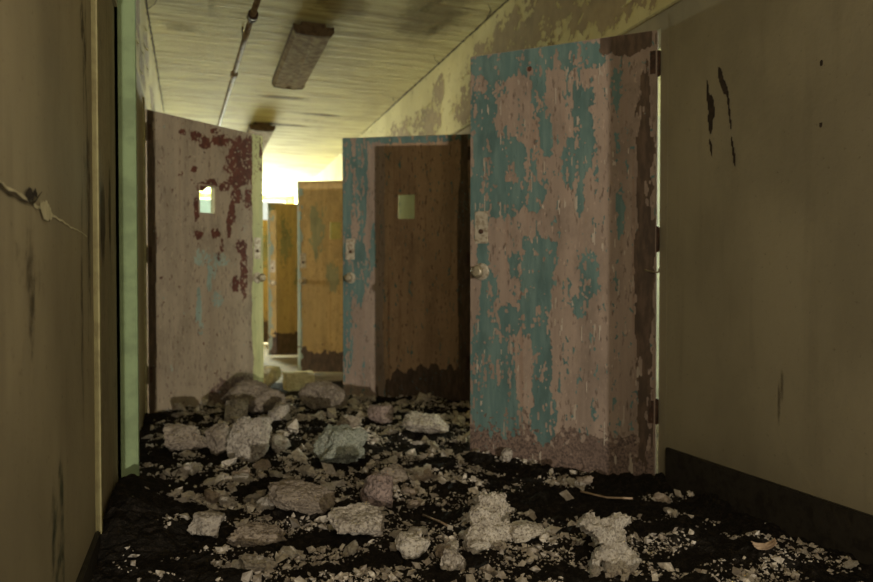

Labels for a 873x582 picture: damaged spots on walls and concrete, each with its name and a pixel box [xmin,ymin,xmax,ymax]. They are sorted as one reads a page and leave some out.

crack [0,181,87,237]
peeling [263,214,297,291]
peeling [309,0,657,476]